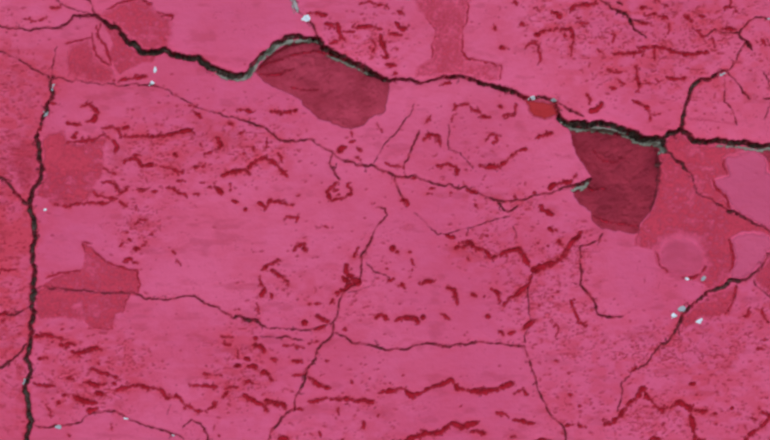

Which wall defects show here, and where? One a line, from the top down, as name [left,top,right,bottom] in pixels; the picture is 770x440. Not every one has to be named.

crack [0,51,216,440]
flaking render [255,36,389,129]
crack [0,0,770,210]
crack [233,207,567,440]
crack [330,111,591,235]
crack [579,234,612,318]
peeling [569,126,770,327]
crack [617,253,770,412]
crack [716,204,757,225]